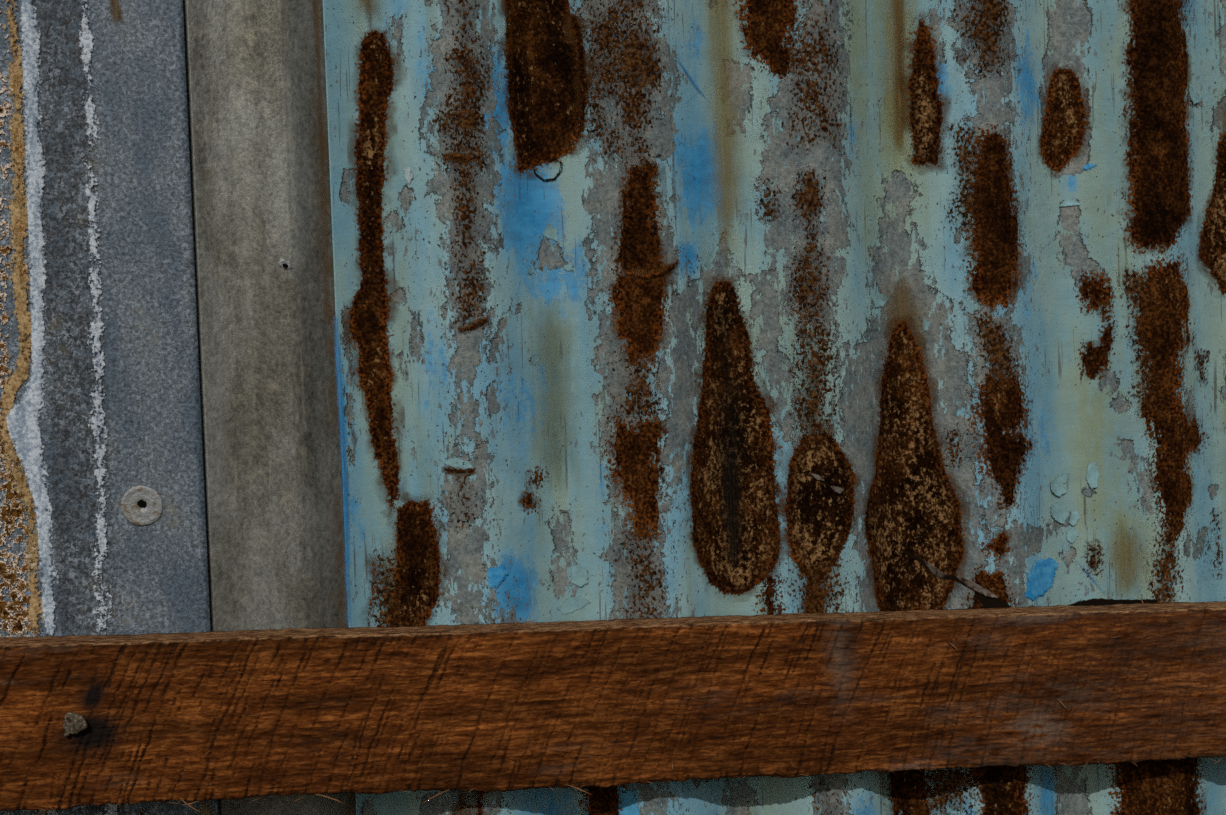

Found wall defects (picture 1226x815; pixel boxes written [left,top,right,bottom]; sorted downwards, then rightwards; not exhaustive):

rust [344,30,478,628]
peeling [382,0,525,624]
rust [429,0,673,619]
peeling [528,0,1118,620]
rust [686,0,1038,615]
rust [1038,64,1092,173]
peeling [1097,369,1133,414]
peeling [1109,436,1159,516]
rust [1073,0,1226,603]
rust [572,785,626,815]
rust [877,765,1037,815]
rust [1103,757,1207,815]